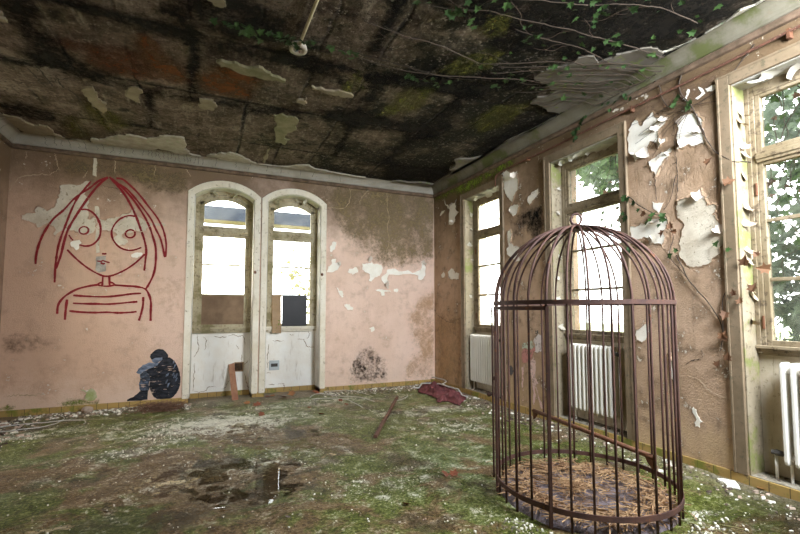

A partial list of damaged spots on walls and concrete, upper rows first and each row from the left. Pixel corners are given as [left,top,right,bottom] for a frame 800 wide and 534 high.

damp [0,0,525,181]
spalling [392,0,765,187]
spalling [3,113,366,178]
damp [470,112,561,156]
peeling [20,180,167,252]
peeling [326,241,427,297]
peeling [474,169,540,218]
peeling [506,228,521,263]
damp [515,207,544,238]
spalling [629,187,723,270]
crack [193,334,249,393]
damp [352,350,384,379]